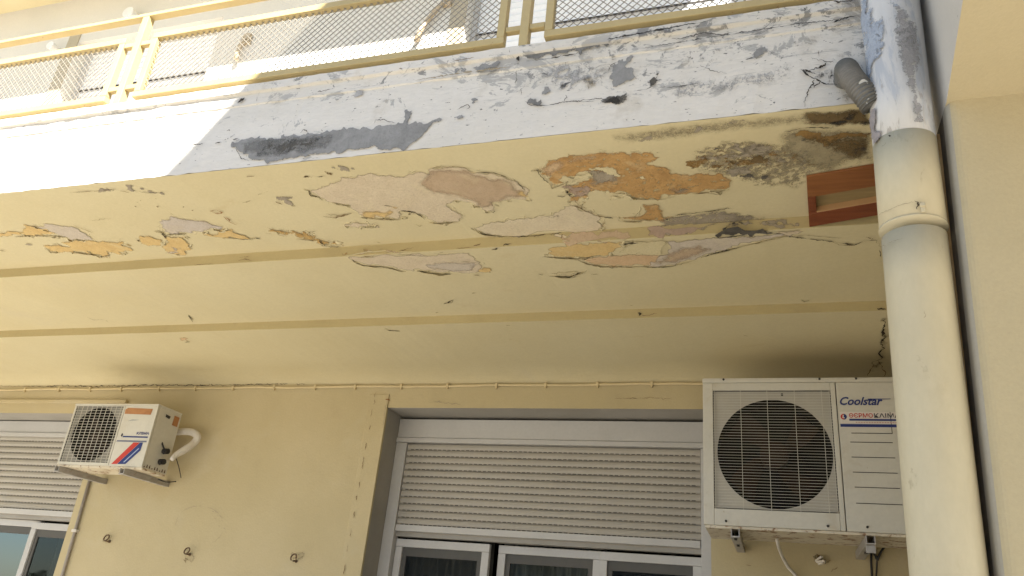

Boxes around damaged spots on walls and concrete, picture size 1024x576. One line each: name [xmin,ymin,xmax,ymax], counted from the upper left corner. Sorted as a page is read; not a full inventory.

spalling [455,61,500,73]
spalling [516,21,705,106]
peeling [670,72,779,95]
crack [801,52,837,103]
water stain [629,94,871,186]
peeling [217,110,799,268]
peeling [0,207,491,276]
crack [867,308,886,377]